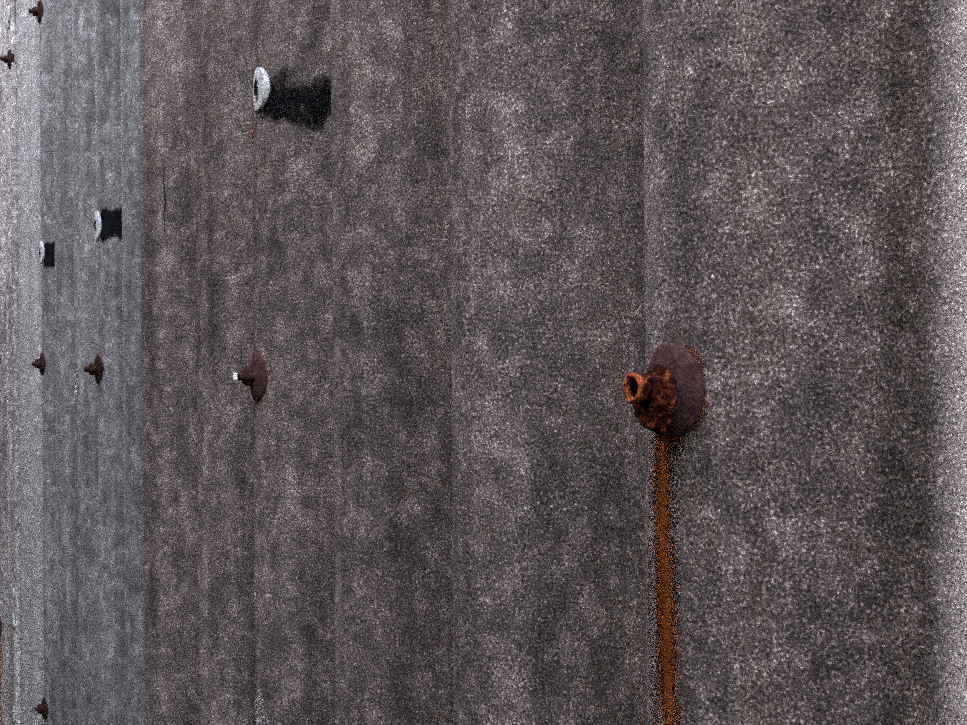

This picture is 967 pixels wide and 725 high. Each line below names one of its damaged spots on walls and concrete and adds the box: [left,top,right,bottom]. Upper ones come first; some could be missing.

corrosion [653,431,681,725]